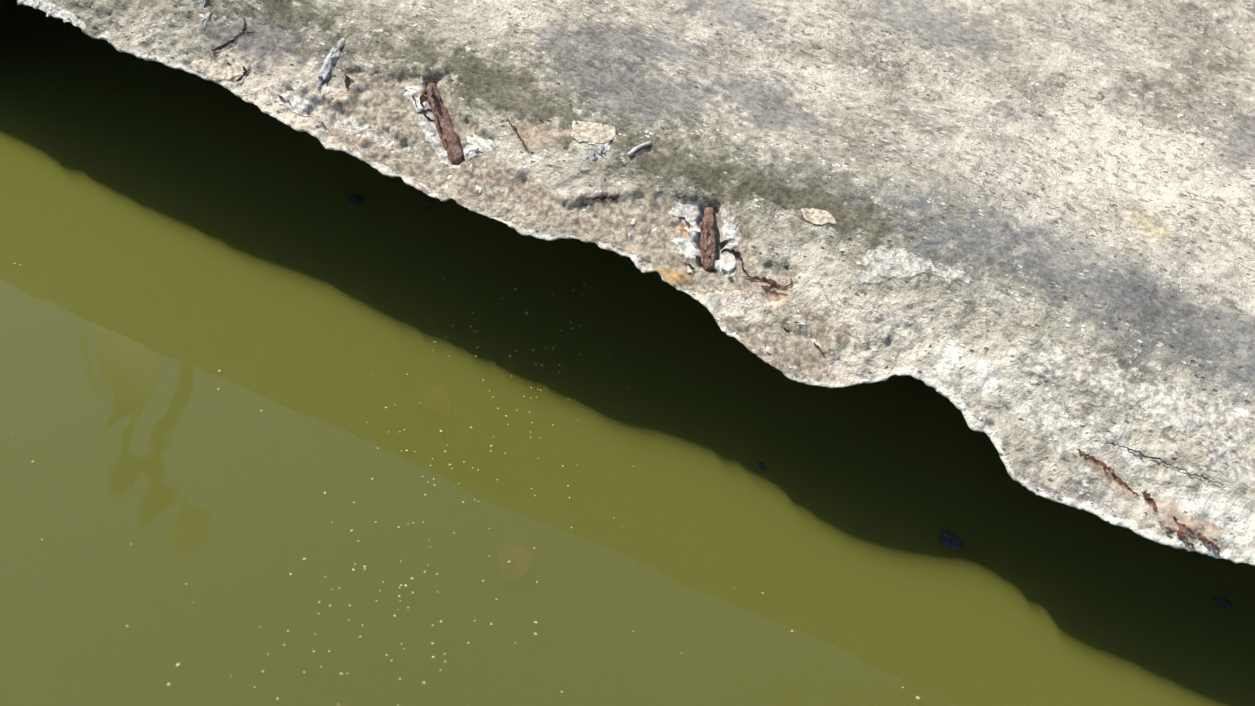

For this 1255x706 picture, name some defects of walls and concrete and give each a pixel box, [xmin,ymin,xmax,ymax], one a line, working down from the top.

spalling [17,0,77,26]
spalling [190,56,250,81]
spalling [261,67,856,384]
spalling [853,247,974,284]
spalling [870,303,926,341]
rust [1091,461,1220,535]